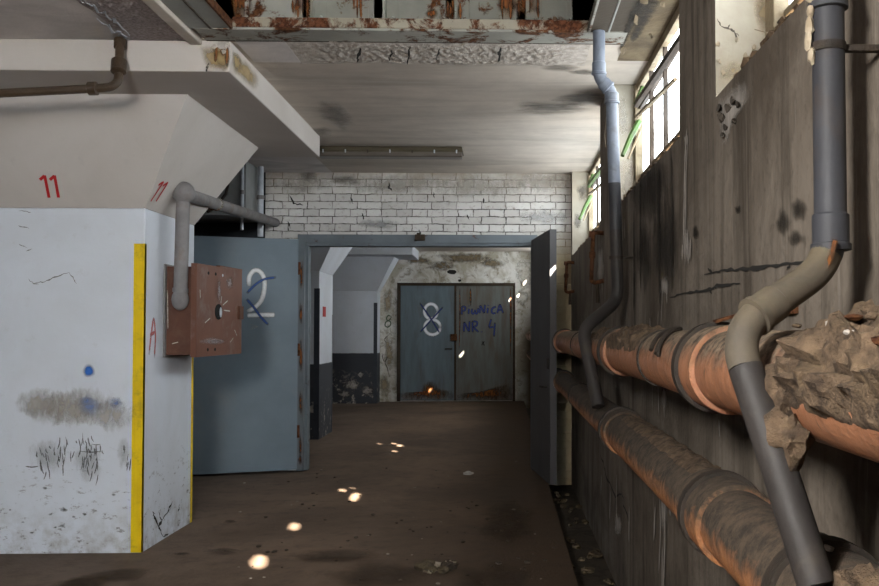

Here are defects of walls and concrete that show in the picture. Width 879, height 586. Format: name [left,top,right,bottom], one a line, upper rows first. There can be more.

rust [233,0,251,15]
rust [292,0,310,18]
rust [446,0,462,19]
rust [499,0,540,20]
rust [205,47,254,83]
peeling [716,88,745,138]
crack [670,261,803,298]
rust [405,383,447,399]